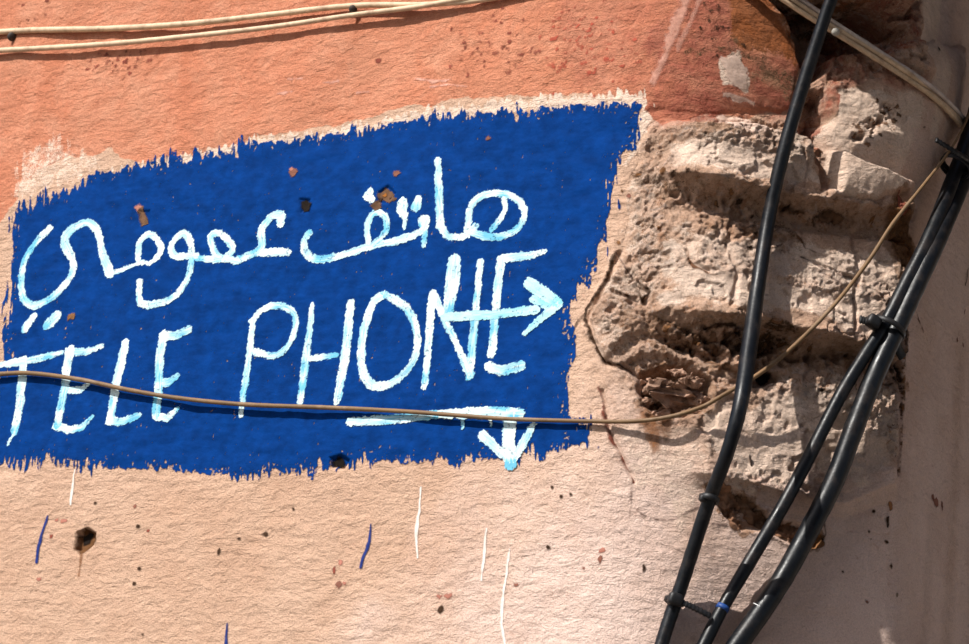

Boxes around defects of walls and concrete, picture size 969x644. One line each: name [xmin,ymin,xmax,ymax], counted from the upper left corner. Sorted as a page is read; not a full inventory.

peeling [506,16,641,74]
crack [575,253,709,373]
spalling [588,0,941,530]
crack [598,387,727,526]
spalling [774,522,798,541]